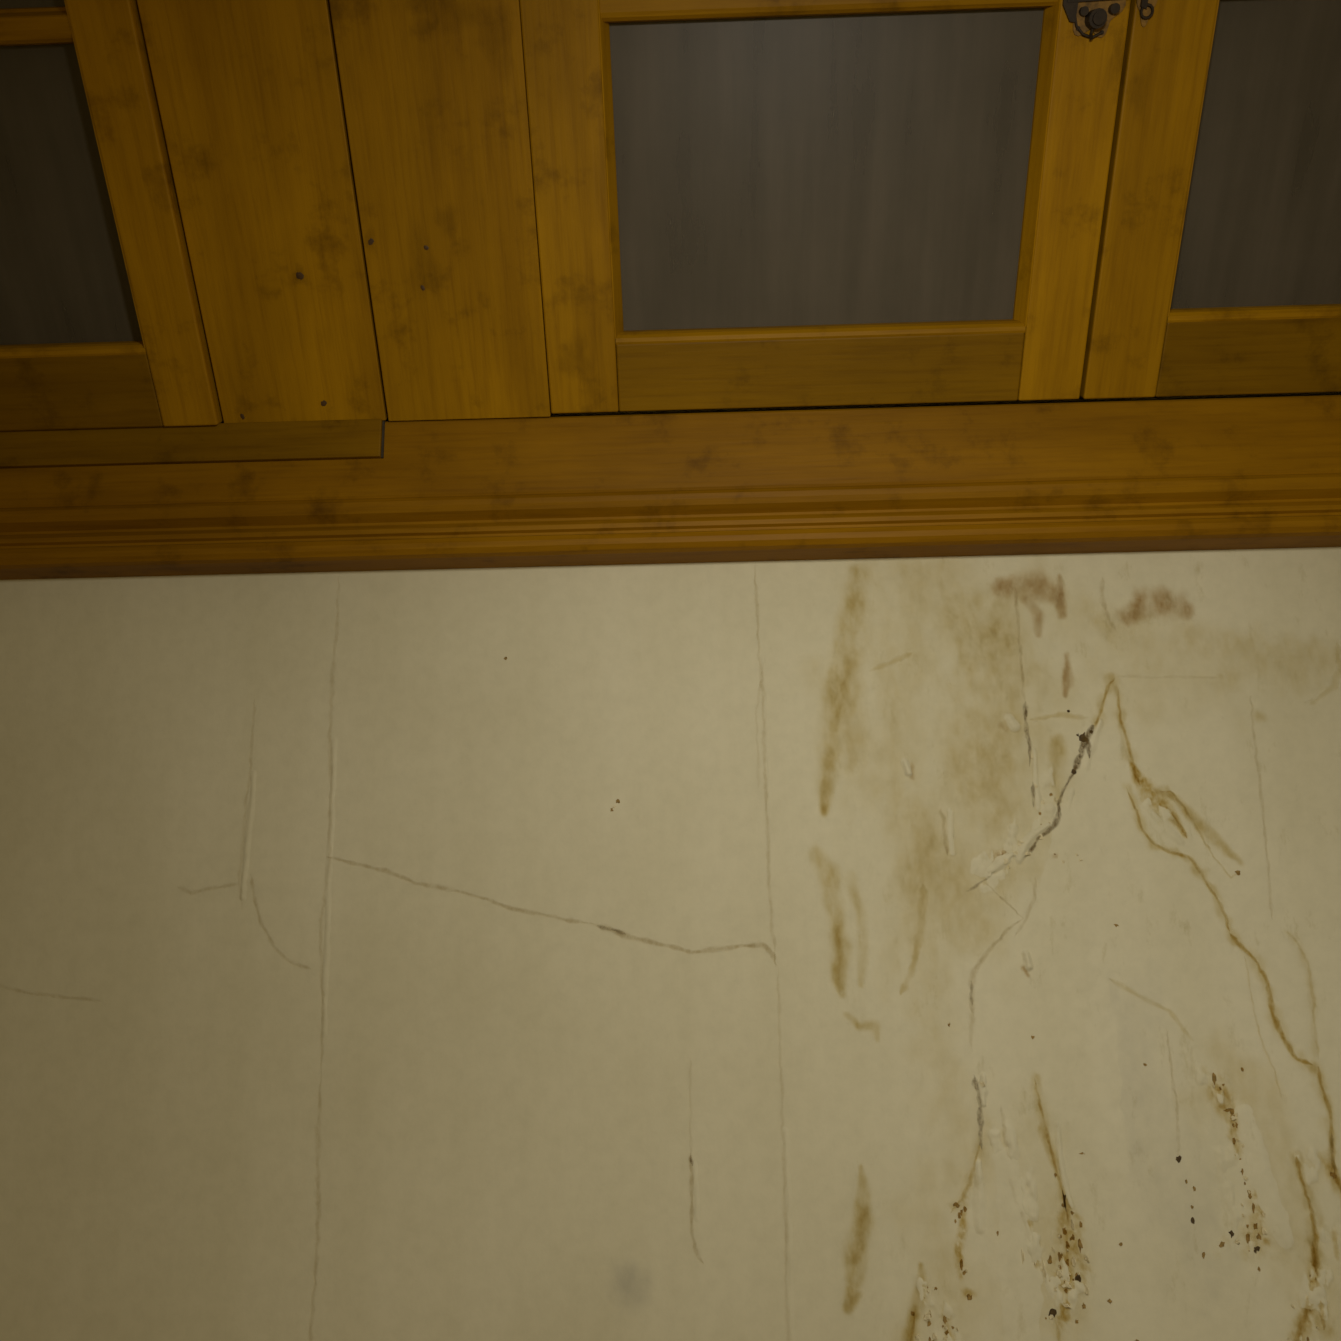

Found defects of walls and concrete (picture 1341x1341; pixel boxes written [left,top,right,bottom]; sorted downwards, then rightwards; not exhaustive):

crack [987,710,1105,874]
crack [1176,1156,1196,1224]
leakage [911,1286,958,1341]